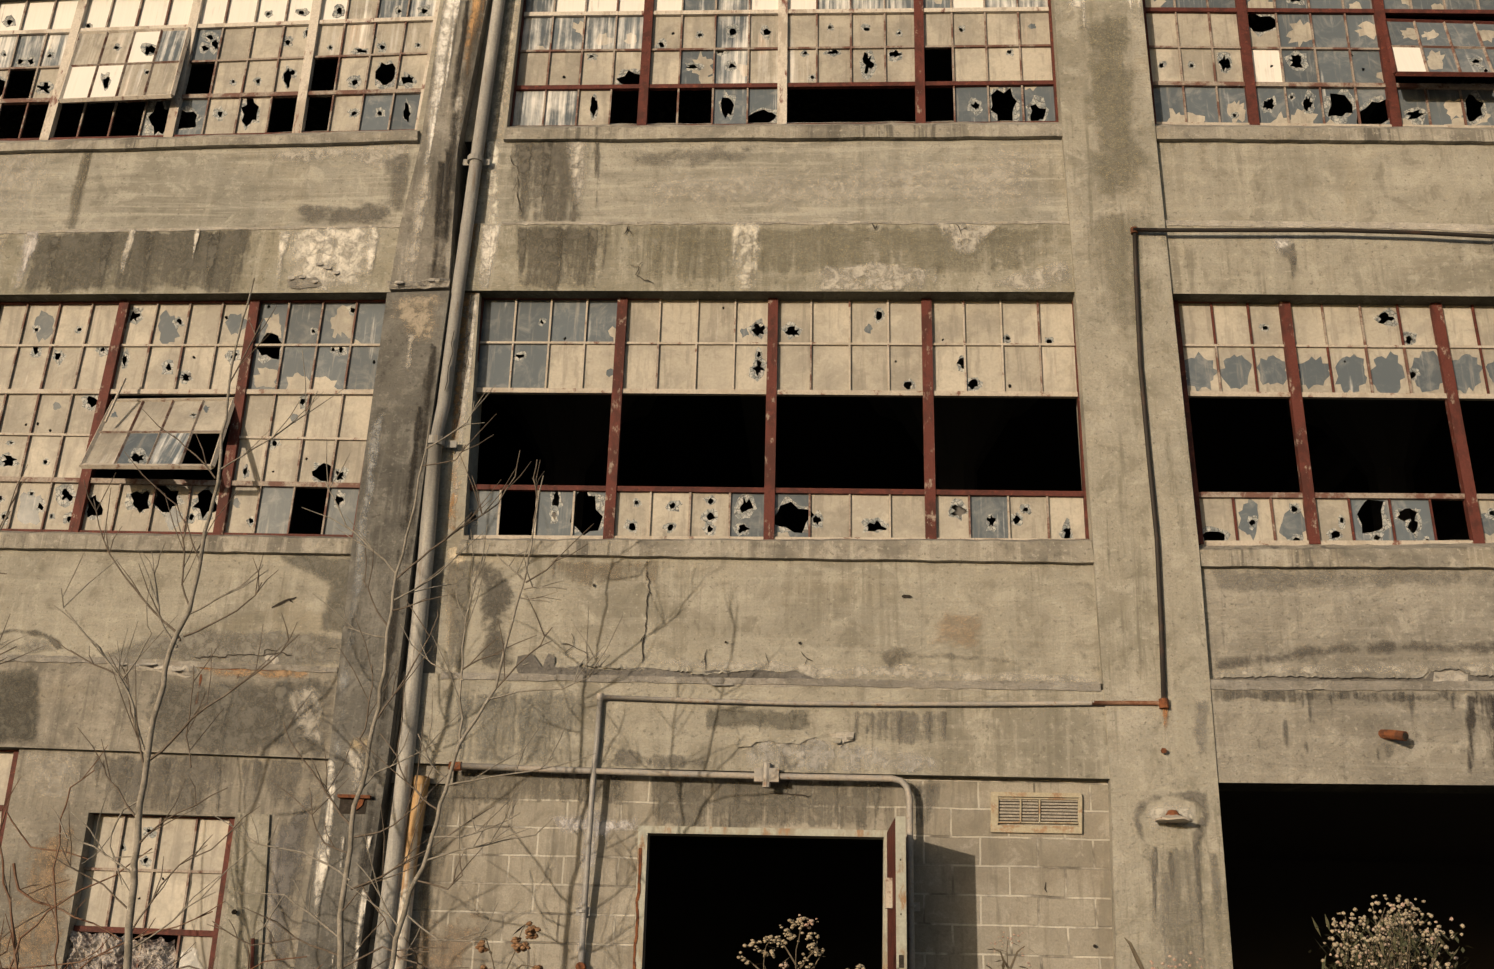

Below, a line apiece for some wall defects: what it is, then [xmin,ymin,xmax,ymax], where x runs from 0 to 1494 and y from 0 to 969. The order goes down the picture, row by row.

rust [465,0,485,70]
leakage [278,0,484,290]
leakage [21,152,249,293]
leakage [460,0,606,418]
leakage [733,223,759,288]
leakage [820,263,925,290]
leakage [447,547,512,669]
peeling [516,653,982,691]
leakage [1218,645,1420,716]
peeling [1213,665,1494,691]
leakage [1439,691,1494,769]
leakage [1136,792,1219,951]